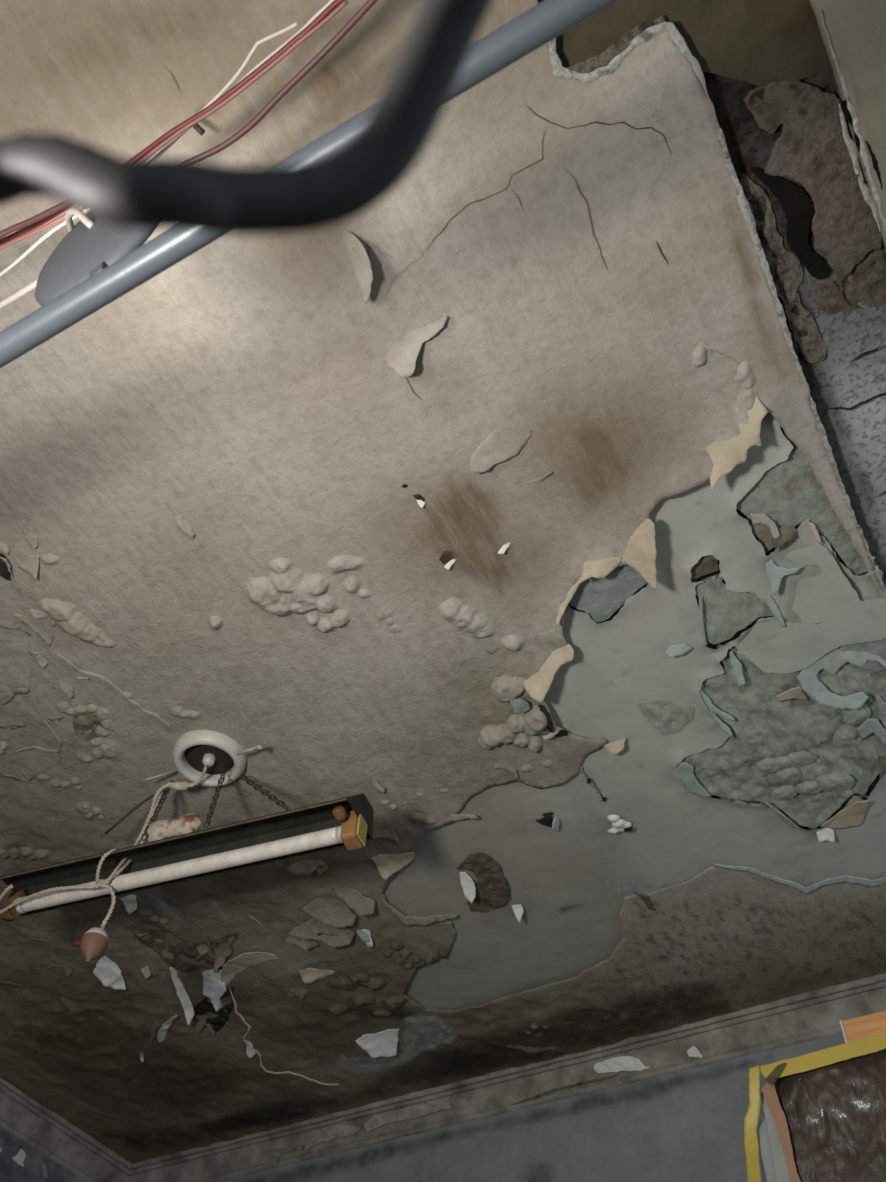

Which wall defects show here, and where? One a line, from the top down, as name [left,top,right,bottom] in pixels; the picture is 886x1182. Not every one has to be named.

spalling [821,11,886,232]
crack [427,107,672,271]
peeling [343,229,422,304]
crack [850,344,883,362]
crack [827,392,886,411]
peeling [371,128,886,1010]
crack [832,552,861,600]
peeling [356,929,373,947]
spalling [121,895,279,1043]
peeling [284,968,334,999]
peeling [355,1029,399,1058]